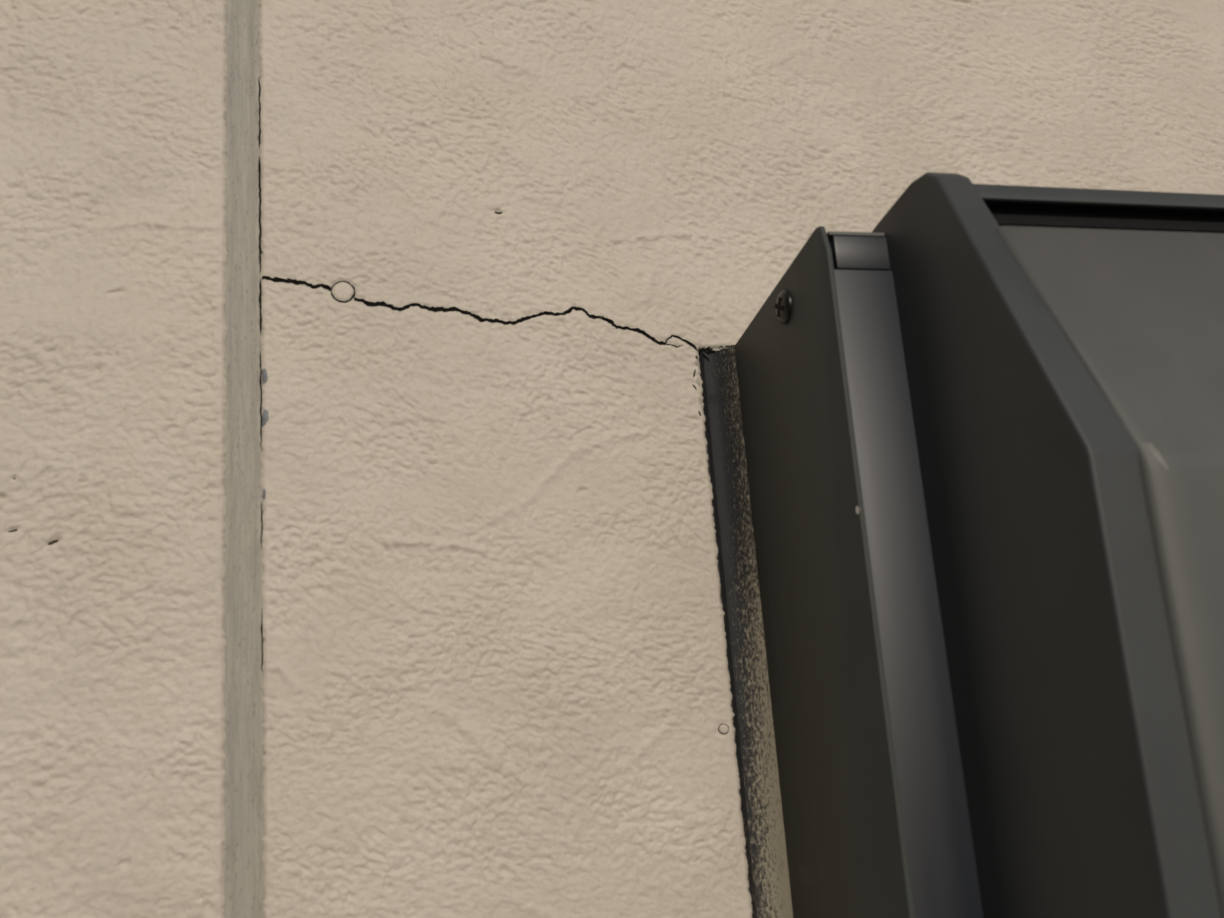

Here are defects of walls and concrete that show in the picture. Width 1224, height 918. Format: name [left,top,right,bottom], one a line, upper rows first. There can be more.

crack [258,81,699,447]
crack [258,501,266,548]
crack [258,615,266,670]